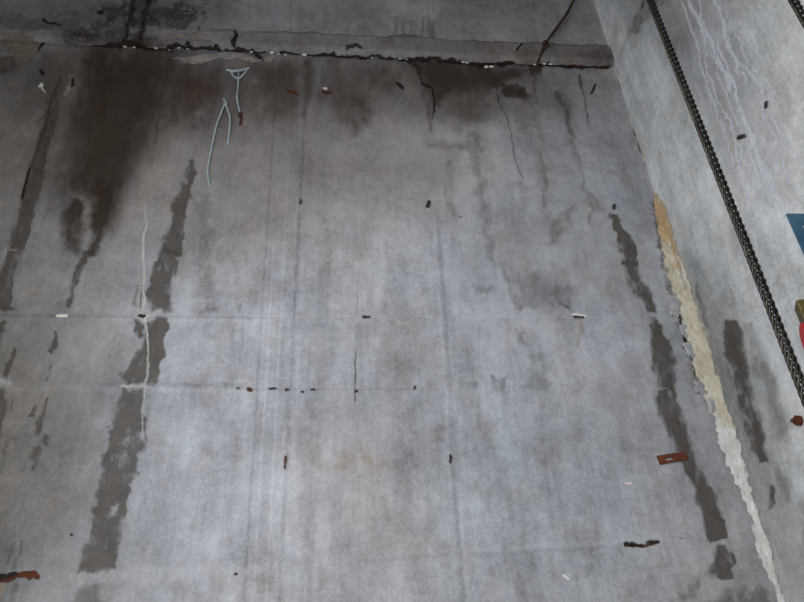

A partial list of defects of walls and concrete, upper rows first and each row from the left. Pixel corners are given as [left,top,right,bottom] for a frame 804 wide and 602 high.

water stain [0,69,61,310]
water stain [56,54,162,317]
crack [94,29,609,119]
water stain [419,62,527,99]
water stain [3,347,16,379]
water stain [29,398,48,470]
water stain [78,159,196,573]
water stain [610,214,736,580]
spalling [653,201,716,414]
water stain [654,192,785,602]
corrosion [0,570,40,582]
corrosion [623,540,659,548]